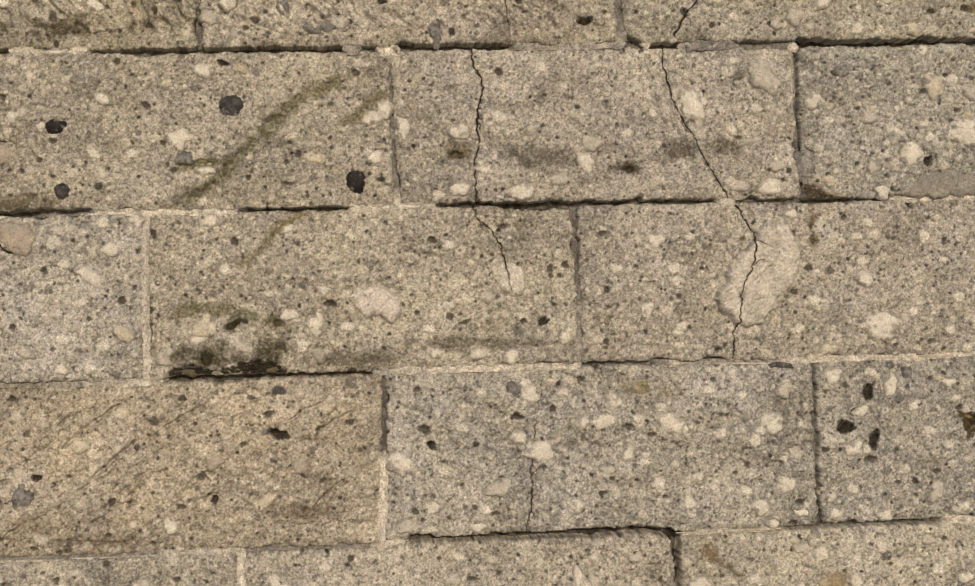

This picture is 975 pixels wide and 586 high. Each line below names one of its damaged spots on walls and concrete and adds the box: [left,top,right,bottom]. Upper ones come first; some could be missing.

crack [471,49,512,290]
crack [662,0,772,359]
crack [525,382,543,533]